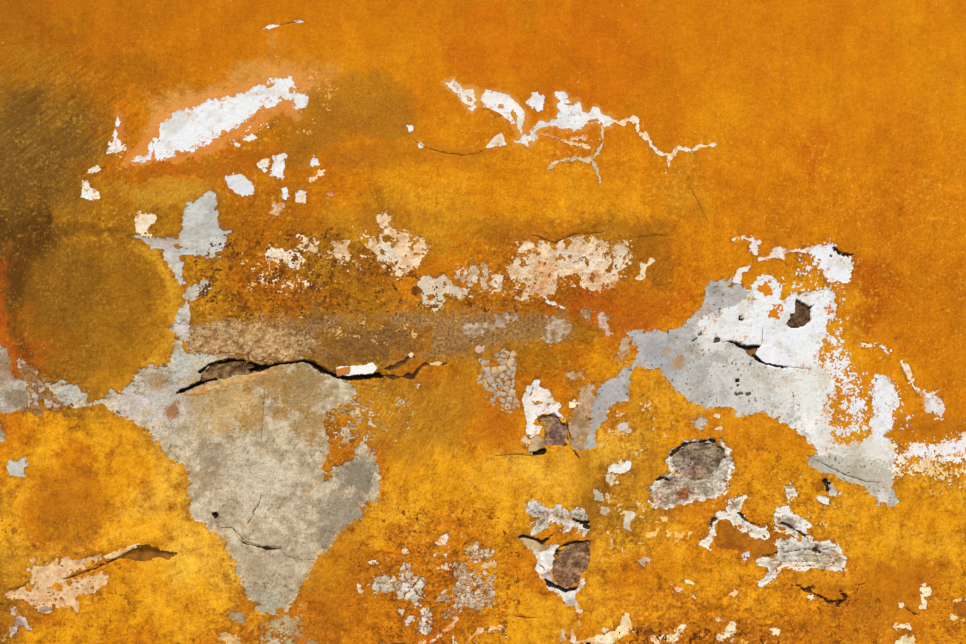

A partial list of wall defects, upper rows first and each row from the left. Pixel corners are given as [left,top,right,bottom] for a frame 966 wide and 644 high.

peeling [106,67,349,168]
peeling [407,79,717,183]
crack [176,352,447,396]
flaking render [0,153,966,644]